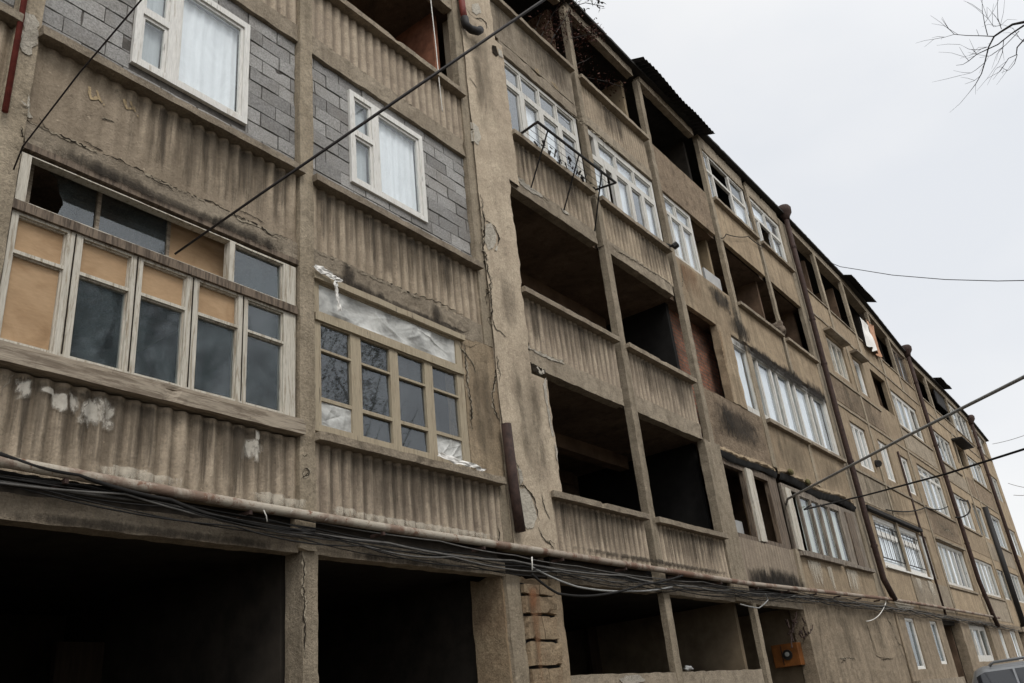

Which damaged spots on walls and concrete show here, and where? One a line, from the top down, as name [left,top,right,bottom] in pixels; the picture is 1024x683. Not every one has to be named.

damp [72,154,143,189]
crack [20,112,290,240]
spalling [485,223,499,251]
crack [459,194,506,431]
peeling [43,387,113,424]
peeling [246,431,260,457]
damp [719,405,758,444]
crack [516,462,555,549]
crack [300,552,308,657]